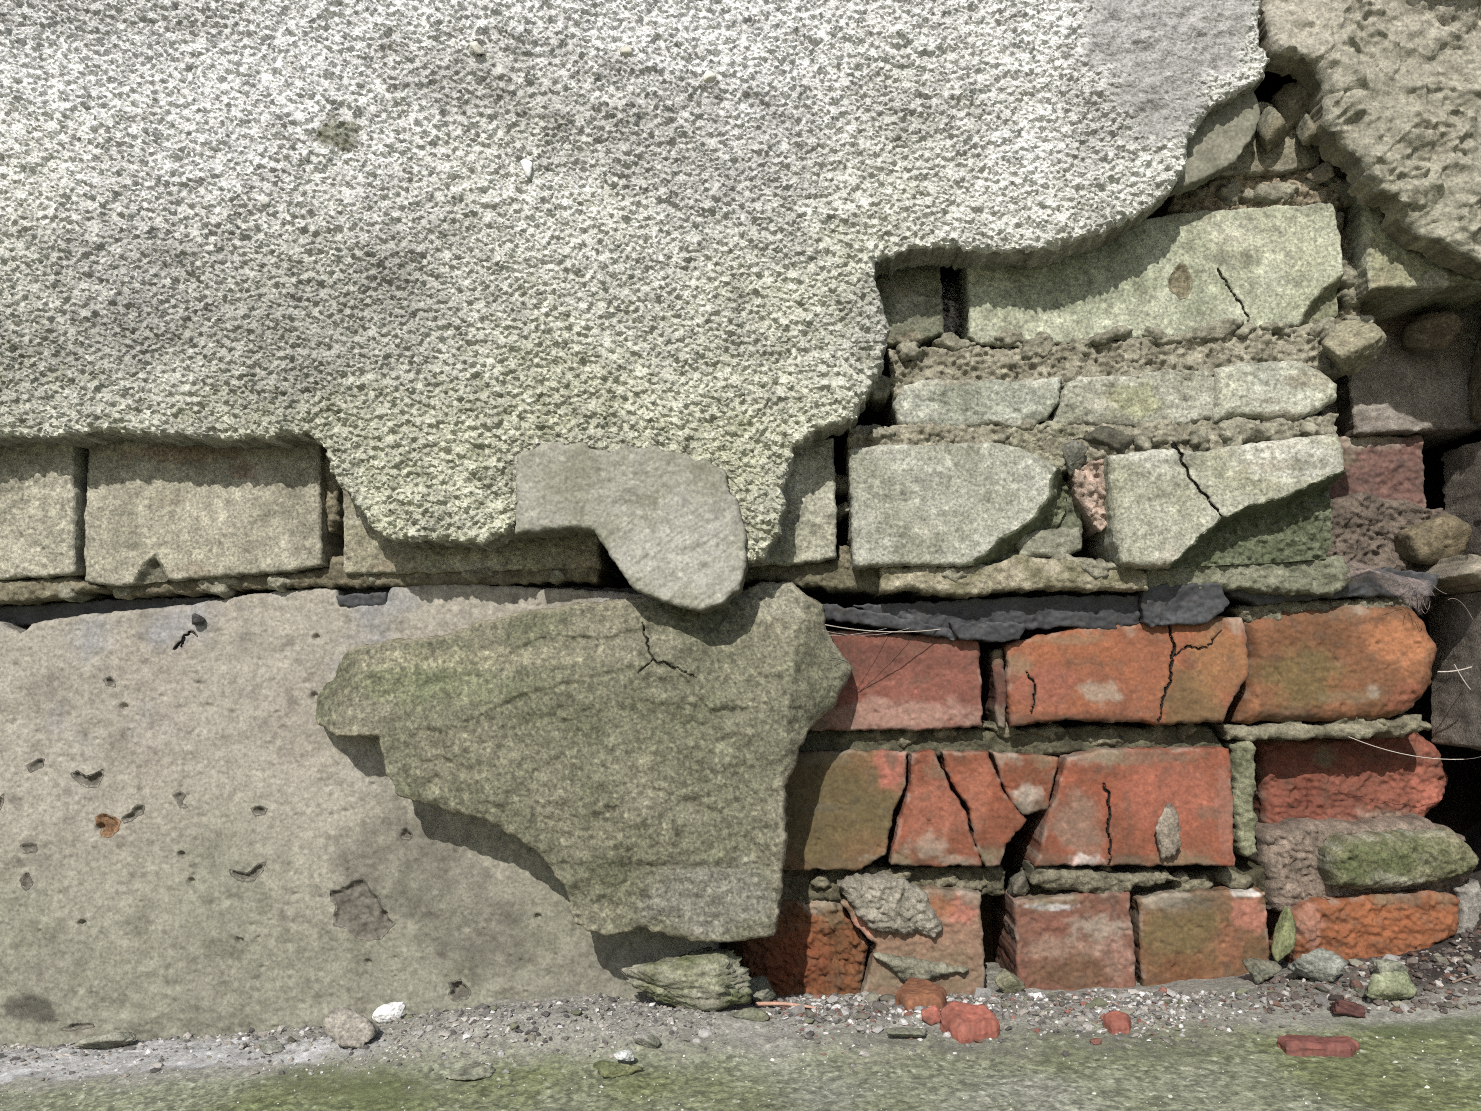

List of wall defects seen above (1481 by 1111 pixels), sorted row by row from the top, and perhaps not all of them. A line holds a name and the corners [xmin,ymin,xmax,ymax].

flaking render [742,0,1481,567]
flaking render [0,421,522,551]
crack [1170,442,1223,518]
spalling [132,553,169,584]
crack [1157,625,1222,723]
spalling [25,758,45,772]
spalling [70,769,104,788]
spalling [121,804,145,824]
crack [1103,783,1112,866]
spalling [229,861,266,882]
spalling [330,878,396,941]
spalling [448,978,471,1002]